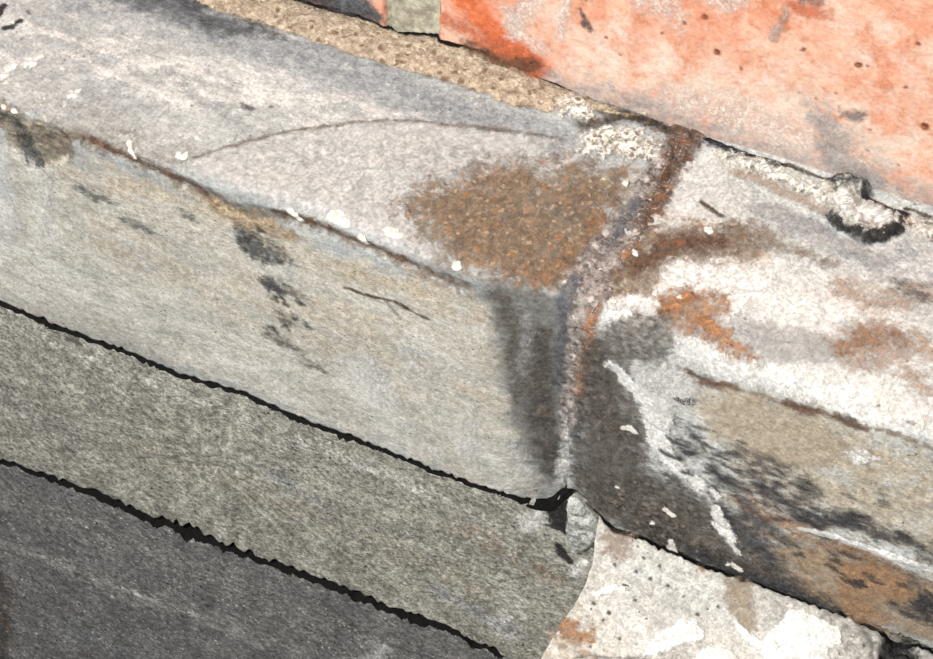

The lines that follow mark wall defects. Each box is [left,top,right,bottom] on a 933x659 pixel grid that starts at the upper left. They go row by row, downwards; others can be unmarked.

rust [390,153,632,296]
rust [572,290,603,398]
rust [654,285,760,367]
water stain [485,284,933,632]